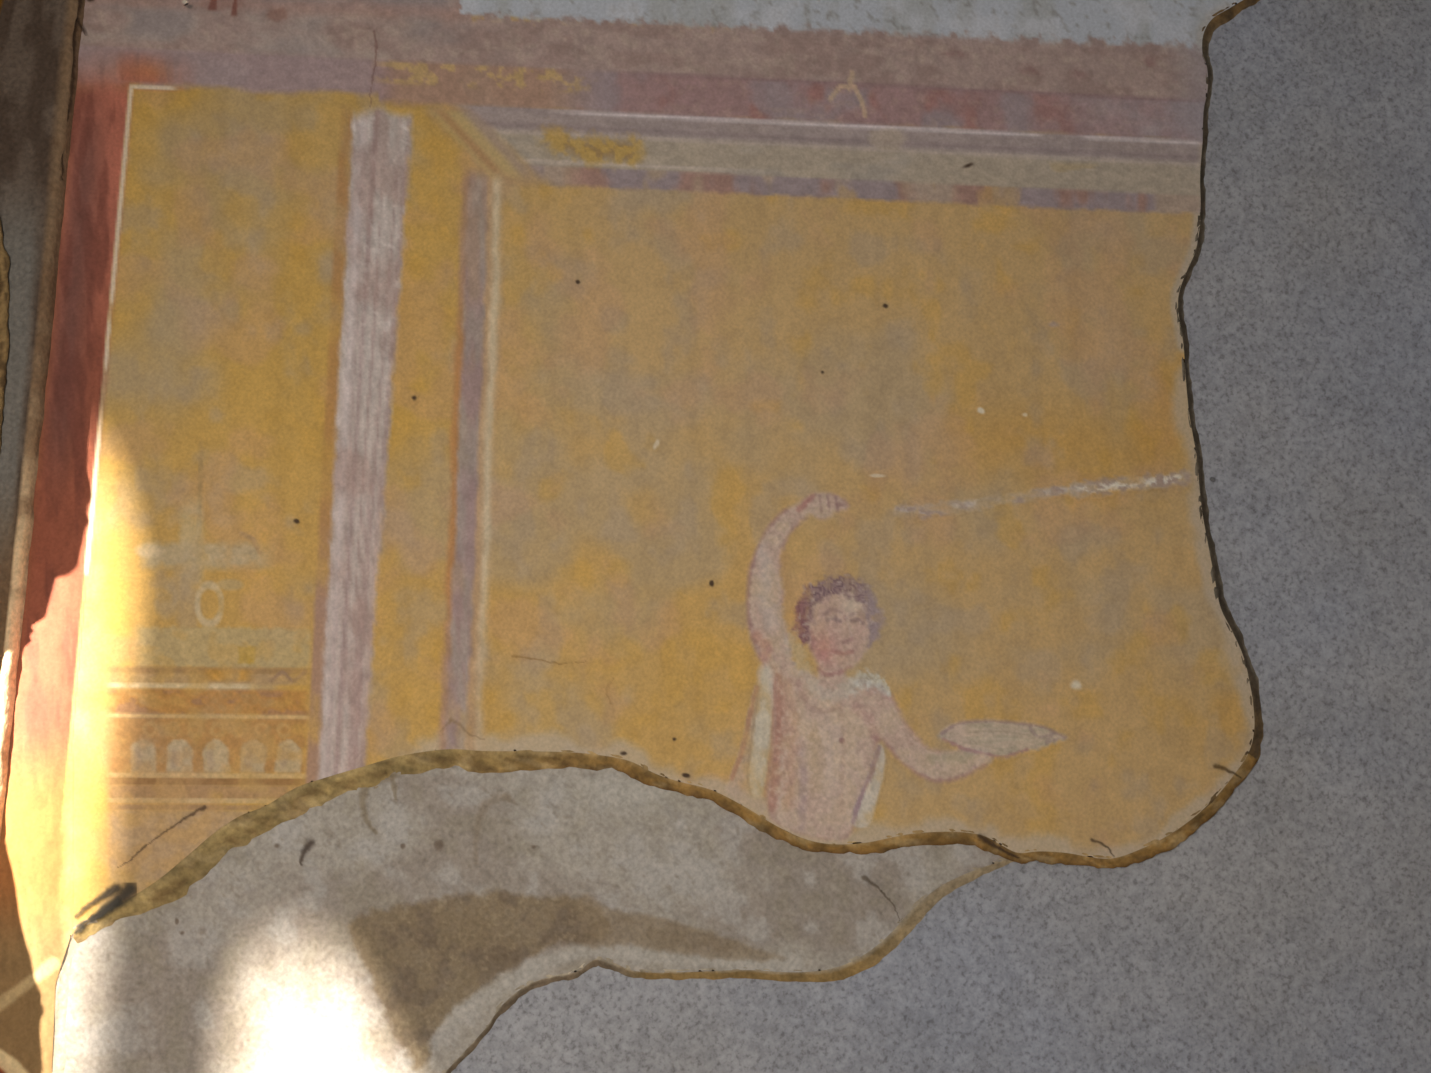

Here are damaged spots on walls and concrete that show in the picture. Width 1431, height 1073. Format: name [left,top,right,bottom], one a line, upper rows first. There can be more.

peeling [532,115,651,174]
peeling [890,0,1264,760]
flaking render [52,749,1258,1073]